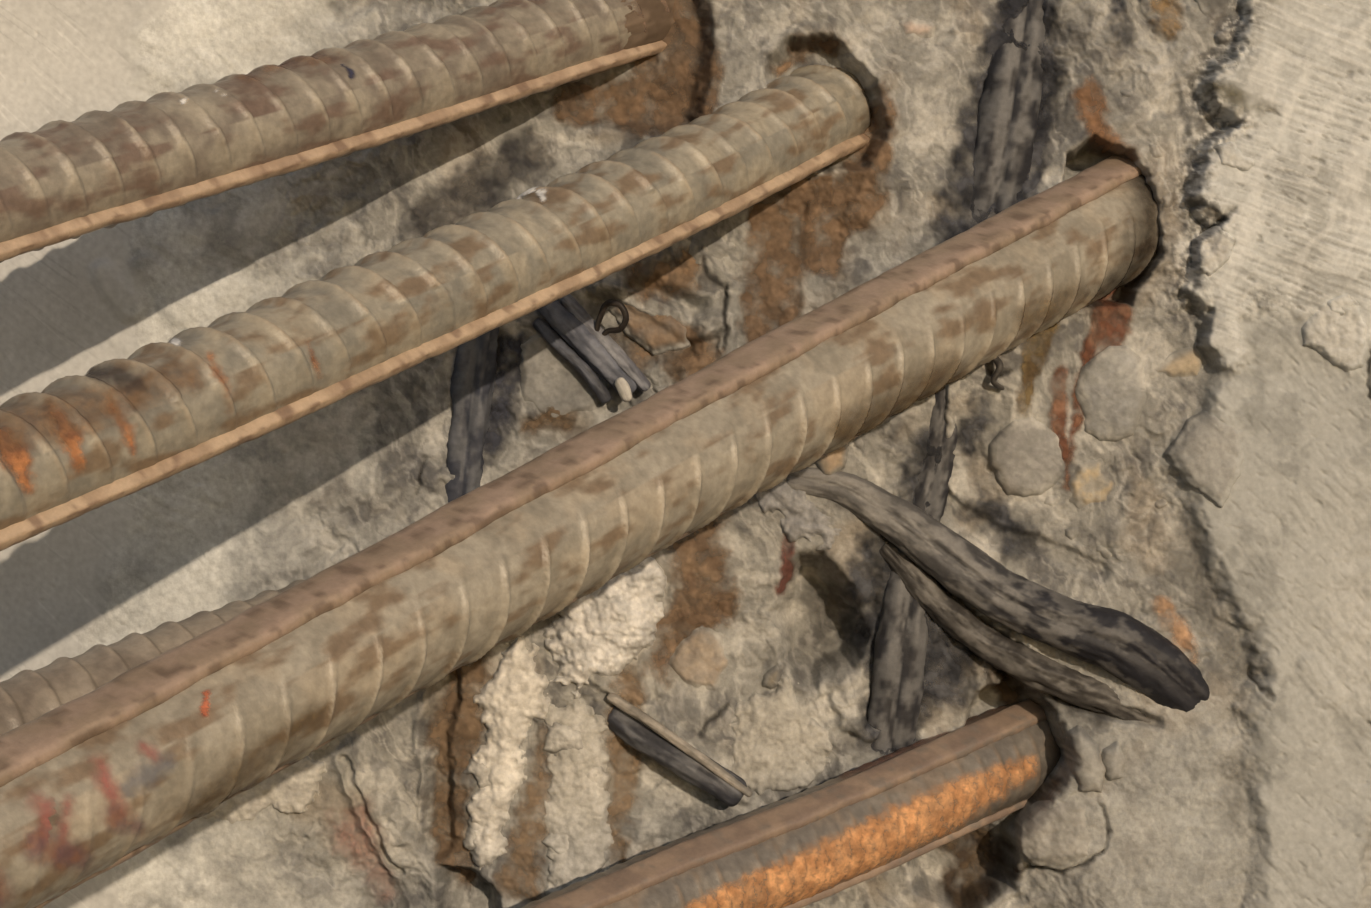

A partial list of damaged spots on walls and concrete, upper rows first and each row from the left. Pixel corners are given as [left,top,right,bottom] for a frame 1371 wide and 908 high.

corrosion [555,0,724,136]
corrosion [776,36,840,75]
corrosion [1075,82,1135,162]
corrosion [741,85,897,343]
corrosion [1081,289,1132,365]
spalling [521,0,1371,908]
corrosion [1017,323,1083,489]
spalling [0,153,1160,908]
corrosion [609,670,645,714]
corrosion [987,669,1038,706]
corrosion [607,733,640,863]
corrosion [940,827,1016,908]